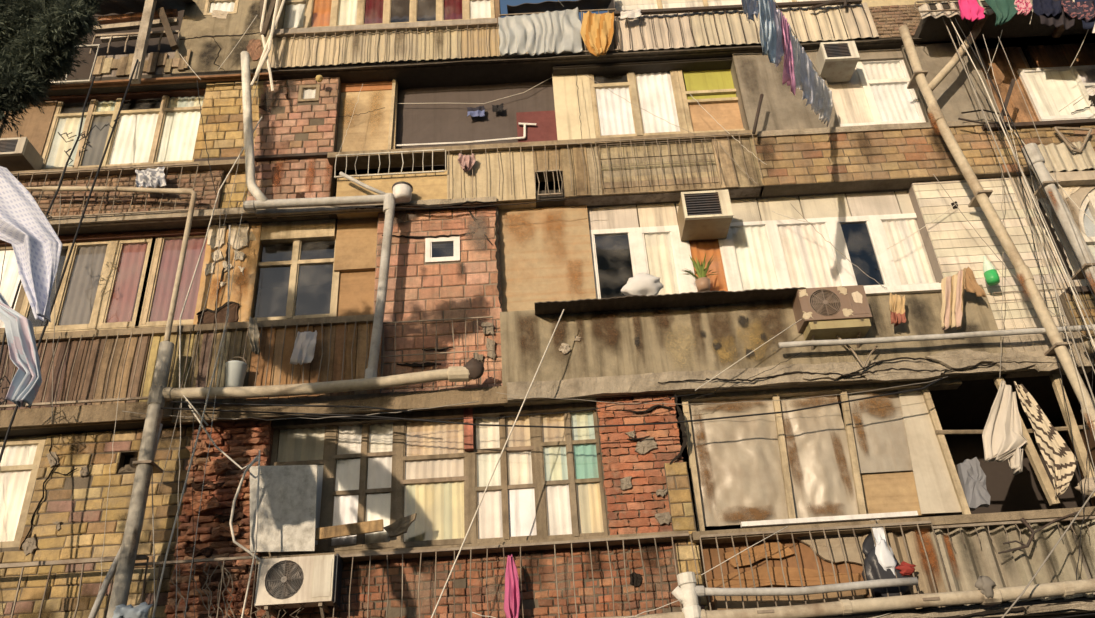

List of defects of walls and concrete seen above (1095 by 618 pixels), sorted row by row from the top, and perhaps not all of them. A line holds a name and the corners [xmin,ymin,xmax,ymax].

leakage [232,4,267,60]
peeling [204,223,250,287]
spalling [197,301,240,324]
crack [622,357,1060,464]
spalling [118,456,138,474]
peeling [625,431,658,455]
leakage [695,401,762,496]
leakage [783,421,801,479]
leakage [833,437,852,489]
spalling [184,441,246,596]
leakage [724,507,770,521]
leakage [810,504,839,514]